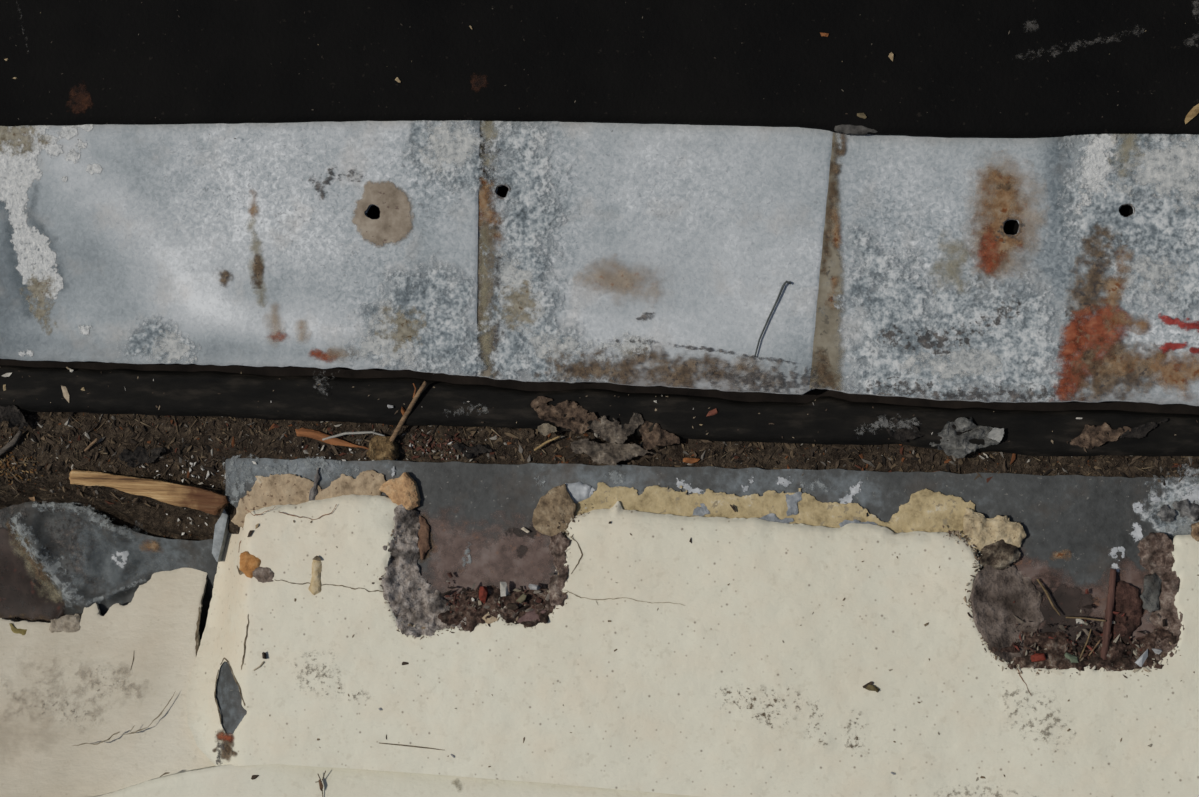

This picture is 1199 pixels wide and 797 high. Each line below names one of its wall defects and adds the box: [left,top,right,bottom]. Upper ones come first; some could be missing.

water stain [0,124,102,335]
rust [308,168,414,247]
rust [478,121,501,238]
rust [977,166,1034,274]
rust [1054,225,1199,401]
peeling [49,613,82,633]
spalling [231,468,1199,671]